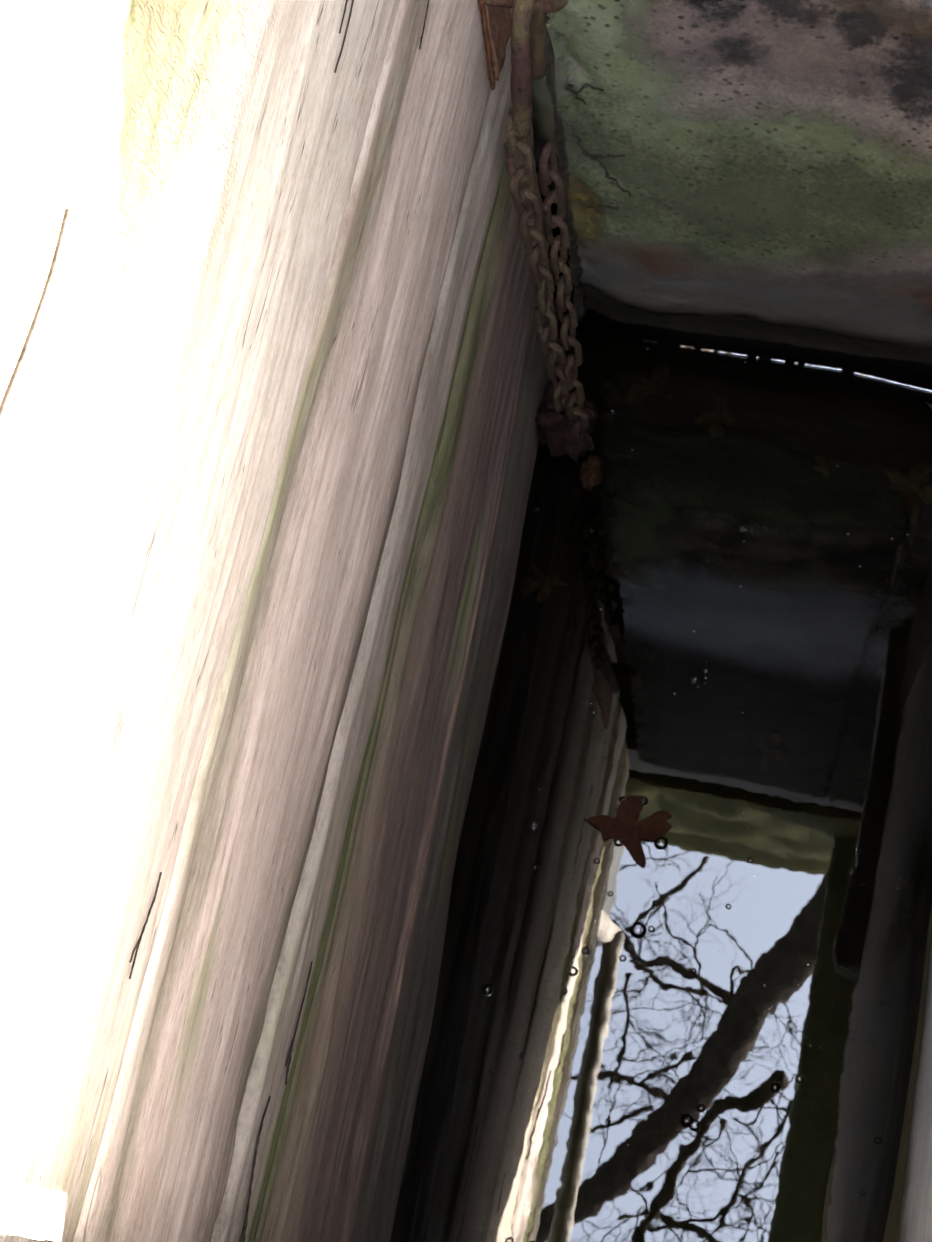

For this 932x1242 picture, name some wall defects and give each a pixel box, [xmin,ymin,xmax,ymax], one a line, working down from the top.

crack [334,0,354,73]
rust [478,0,496,90]
water stain [618,0,932,168]
water stain [654,238,932,280]
crack [0,208,70,419]